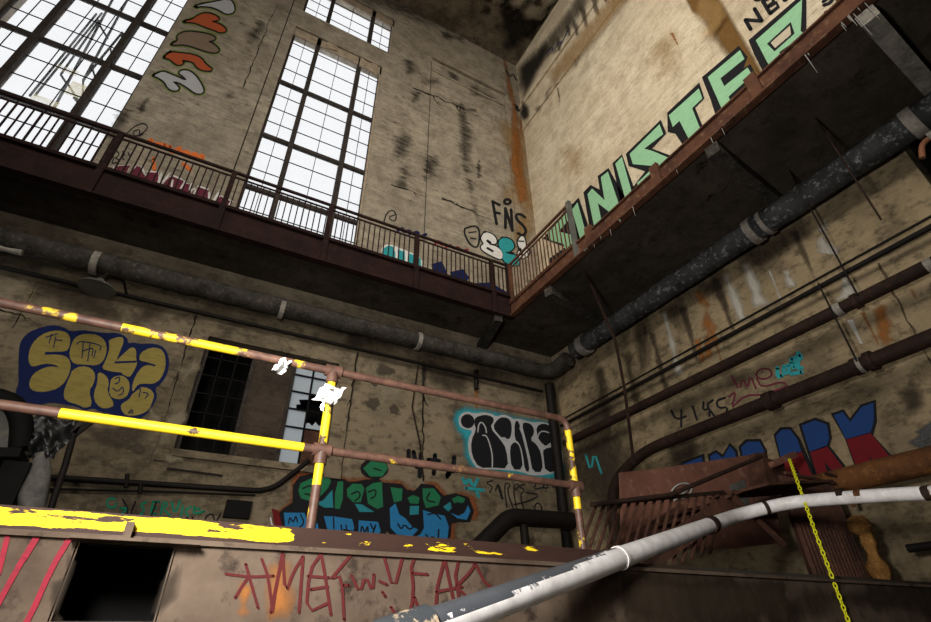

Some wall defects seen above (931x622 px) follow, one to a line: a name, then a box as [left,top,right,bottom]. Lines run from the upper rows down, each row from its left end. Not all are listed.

leakage [538,0,623,96]
leakage [687,0,760,75]
rust [504,60,525,202]